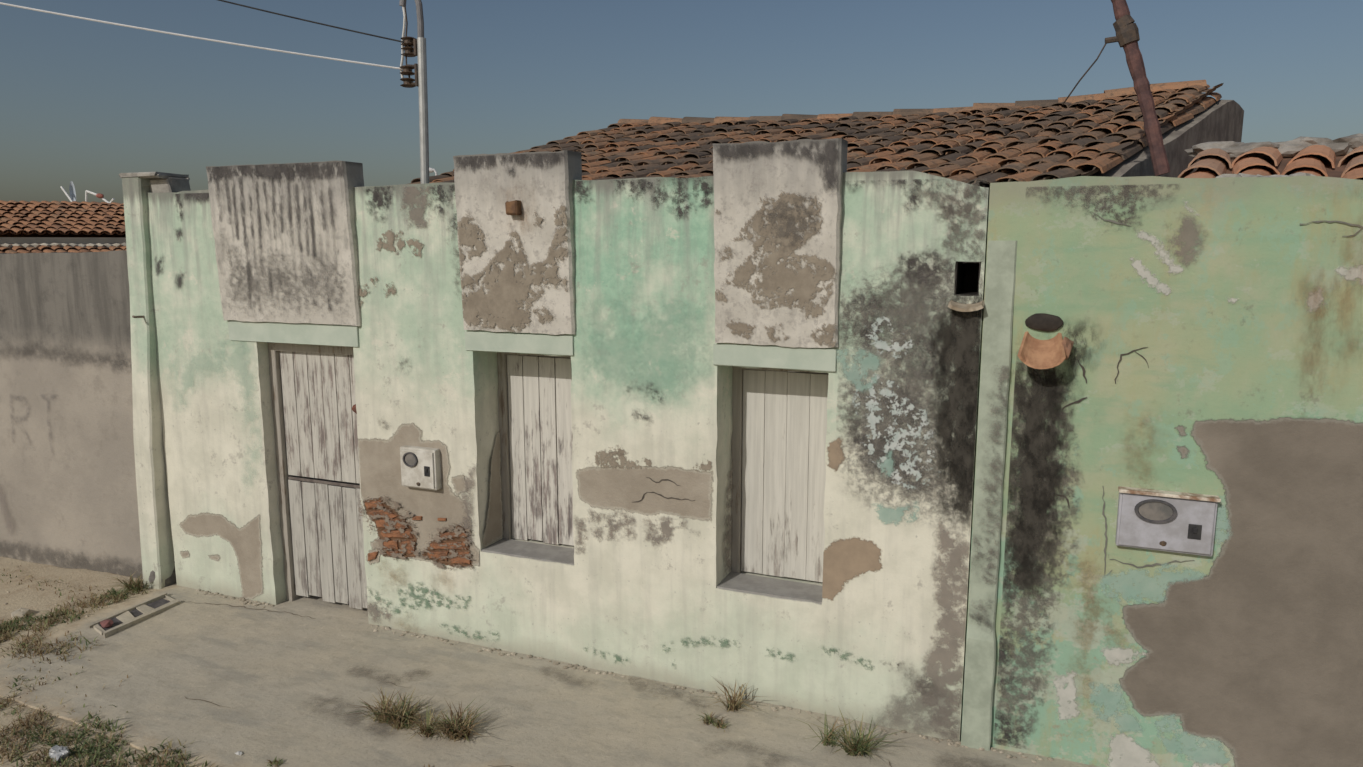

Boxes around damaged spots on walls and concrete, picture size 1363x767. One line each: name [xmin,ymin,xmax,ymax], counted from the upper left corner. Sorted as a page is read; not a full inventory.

damp [175,162,344,257]
peeling [456,205,569,332]
peeling [358,423,503,570]
peeling [595,446,652,469]
damp [715,140,1086,746]
peeling [1176,425,1190,459]
peeling [1101,564,1204,602]
peeling [1101,648,1146,666]
peeling [1053,671,1230,767]